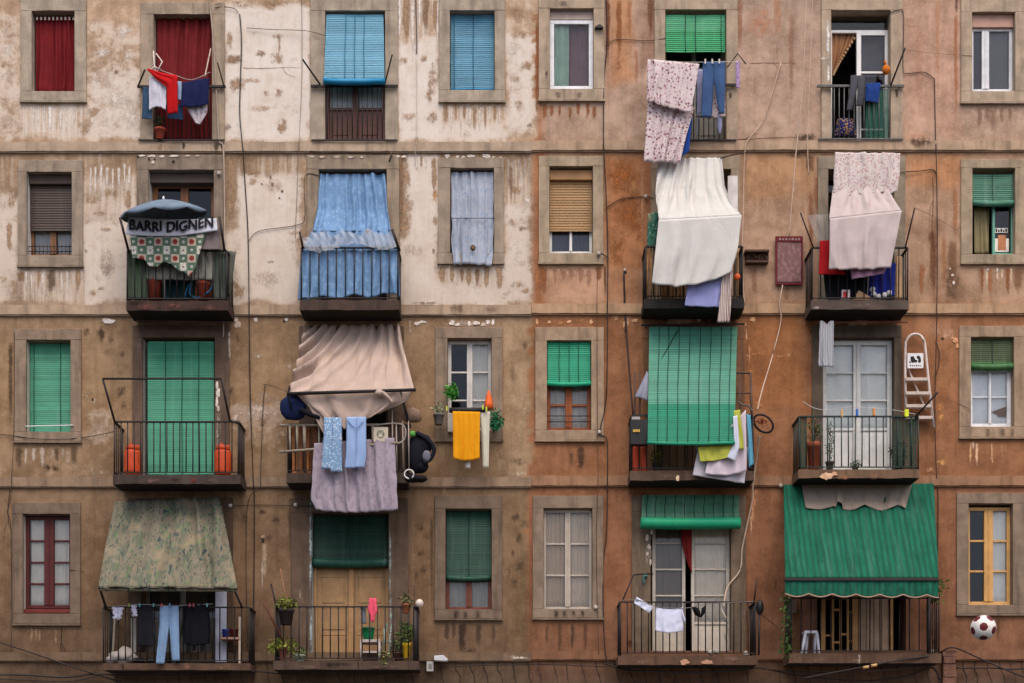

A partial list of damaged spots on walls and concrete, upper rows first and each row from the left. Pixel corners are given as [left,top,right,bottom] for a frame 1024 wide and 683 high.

peeling [227,34,241,64]
peeling [398,0,439,100]
peeling [230,78,283,110]
water stain [444,105,500,130]
water stain [438,267,503,287]
water stain [25,447,70,470]